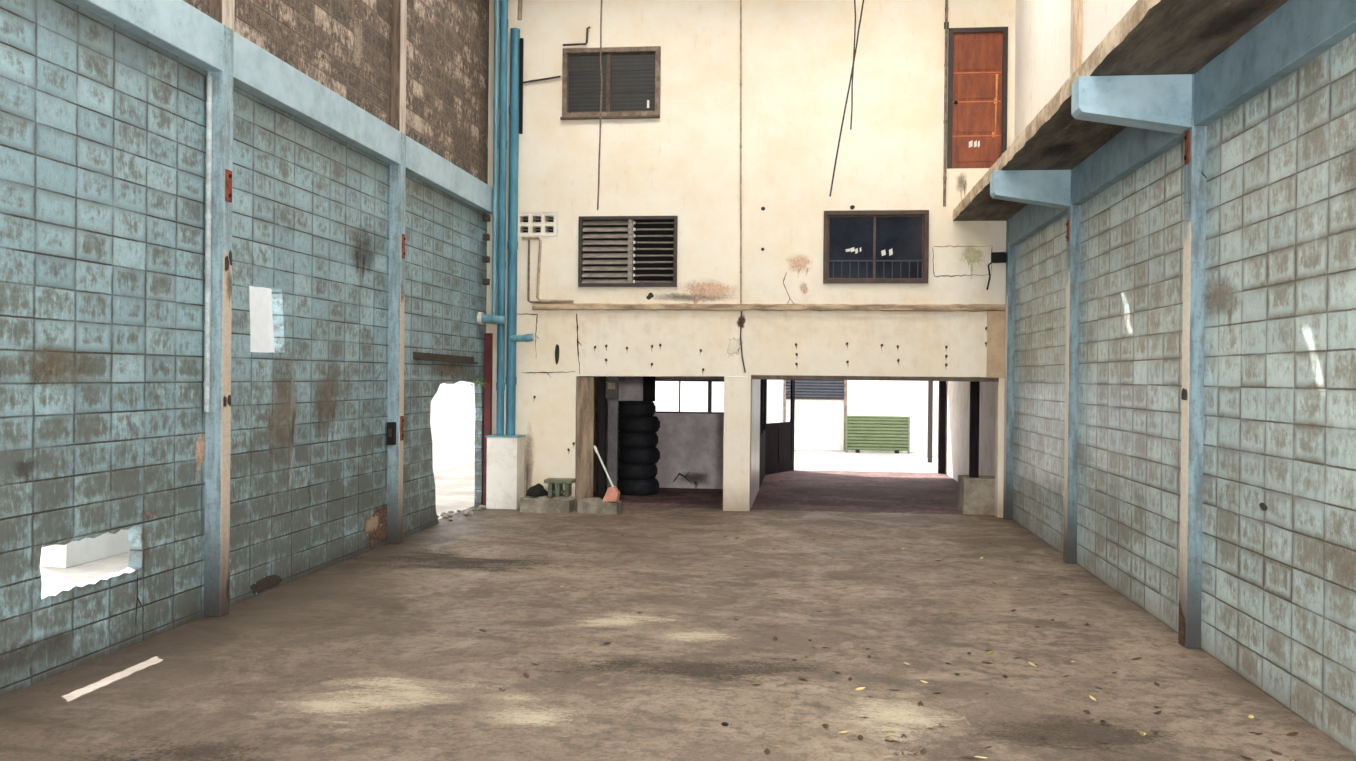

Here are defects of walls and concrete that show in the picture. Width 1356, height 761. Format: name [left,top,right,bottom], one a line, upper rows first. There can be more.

damp [269,380,296,458]